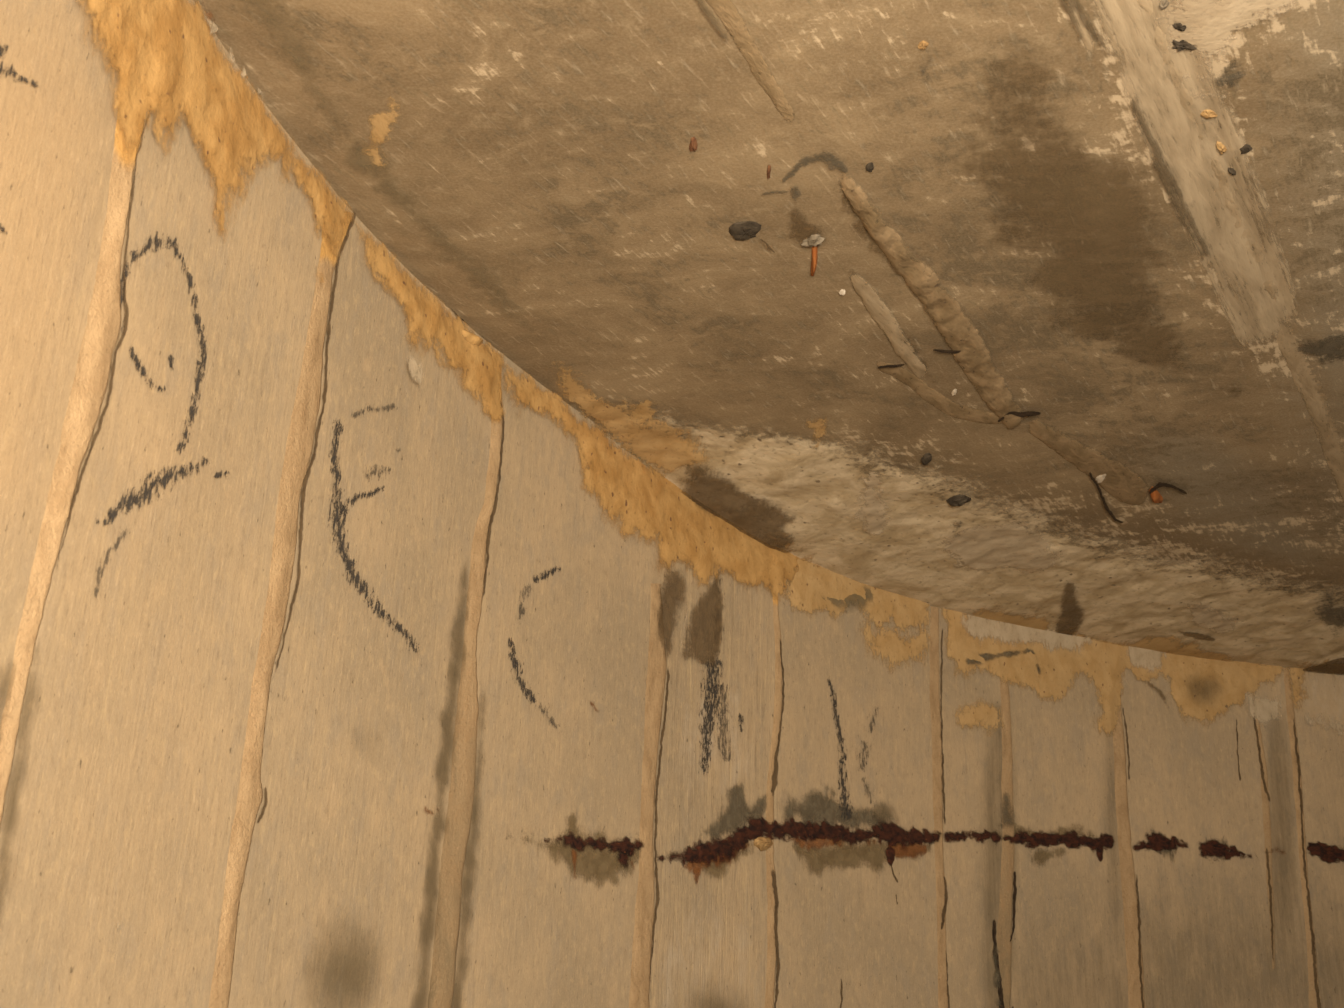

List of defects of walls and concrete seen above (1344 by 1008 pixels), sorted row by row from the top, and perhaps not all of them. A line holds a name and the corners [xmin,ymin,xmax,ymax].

leakage [968,66,1178,364]
leakage [438,616,463,783]
leakage [659,571,723,665]
spalling [967,649,1040,673]
leakage [423,807,442,946]
corrosion [544,815,643,883]
corrosion [658,786,1114,883]
corrosion [1133,832,1252,860]
crack [1236,716,1321,1008]
corrosion [1307,841,1344,864]
crack [992,872,1017,1008]